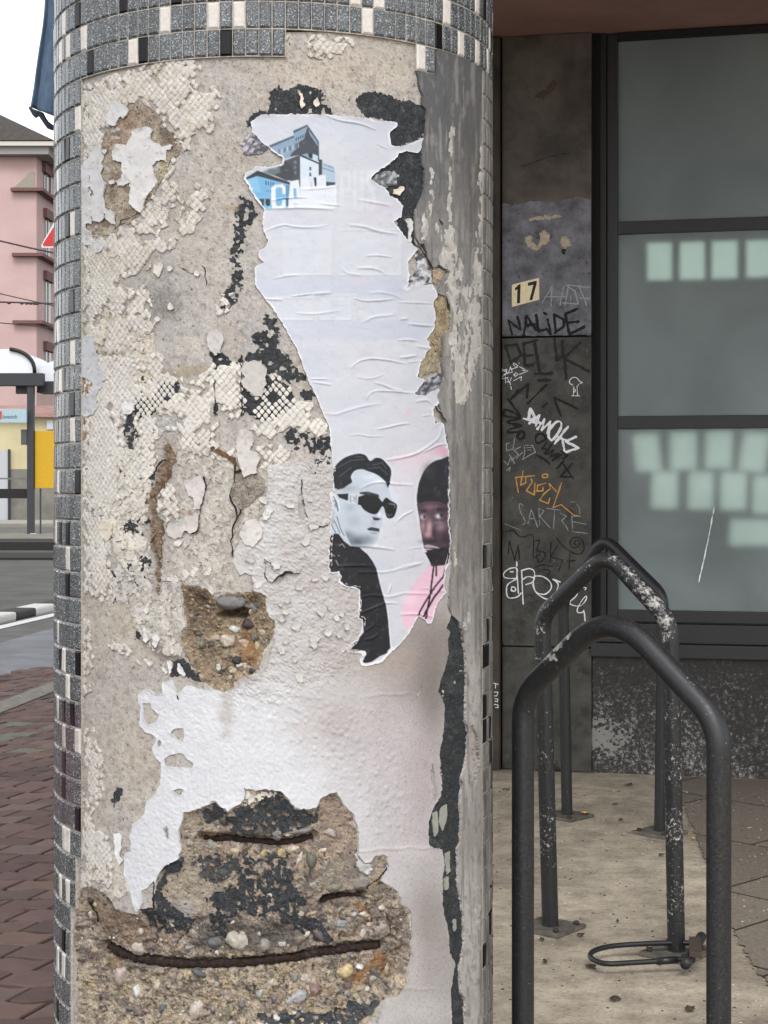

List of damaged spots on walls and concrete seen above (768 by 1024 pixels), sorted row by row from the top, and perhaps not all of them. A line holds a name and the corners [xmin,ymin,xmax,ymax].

corrosion [145,444,177,594]
crack [191,466,242,556]
peeling [73,59,465,1024]